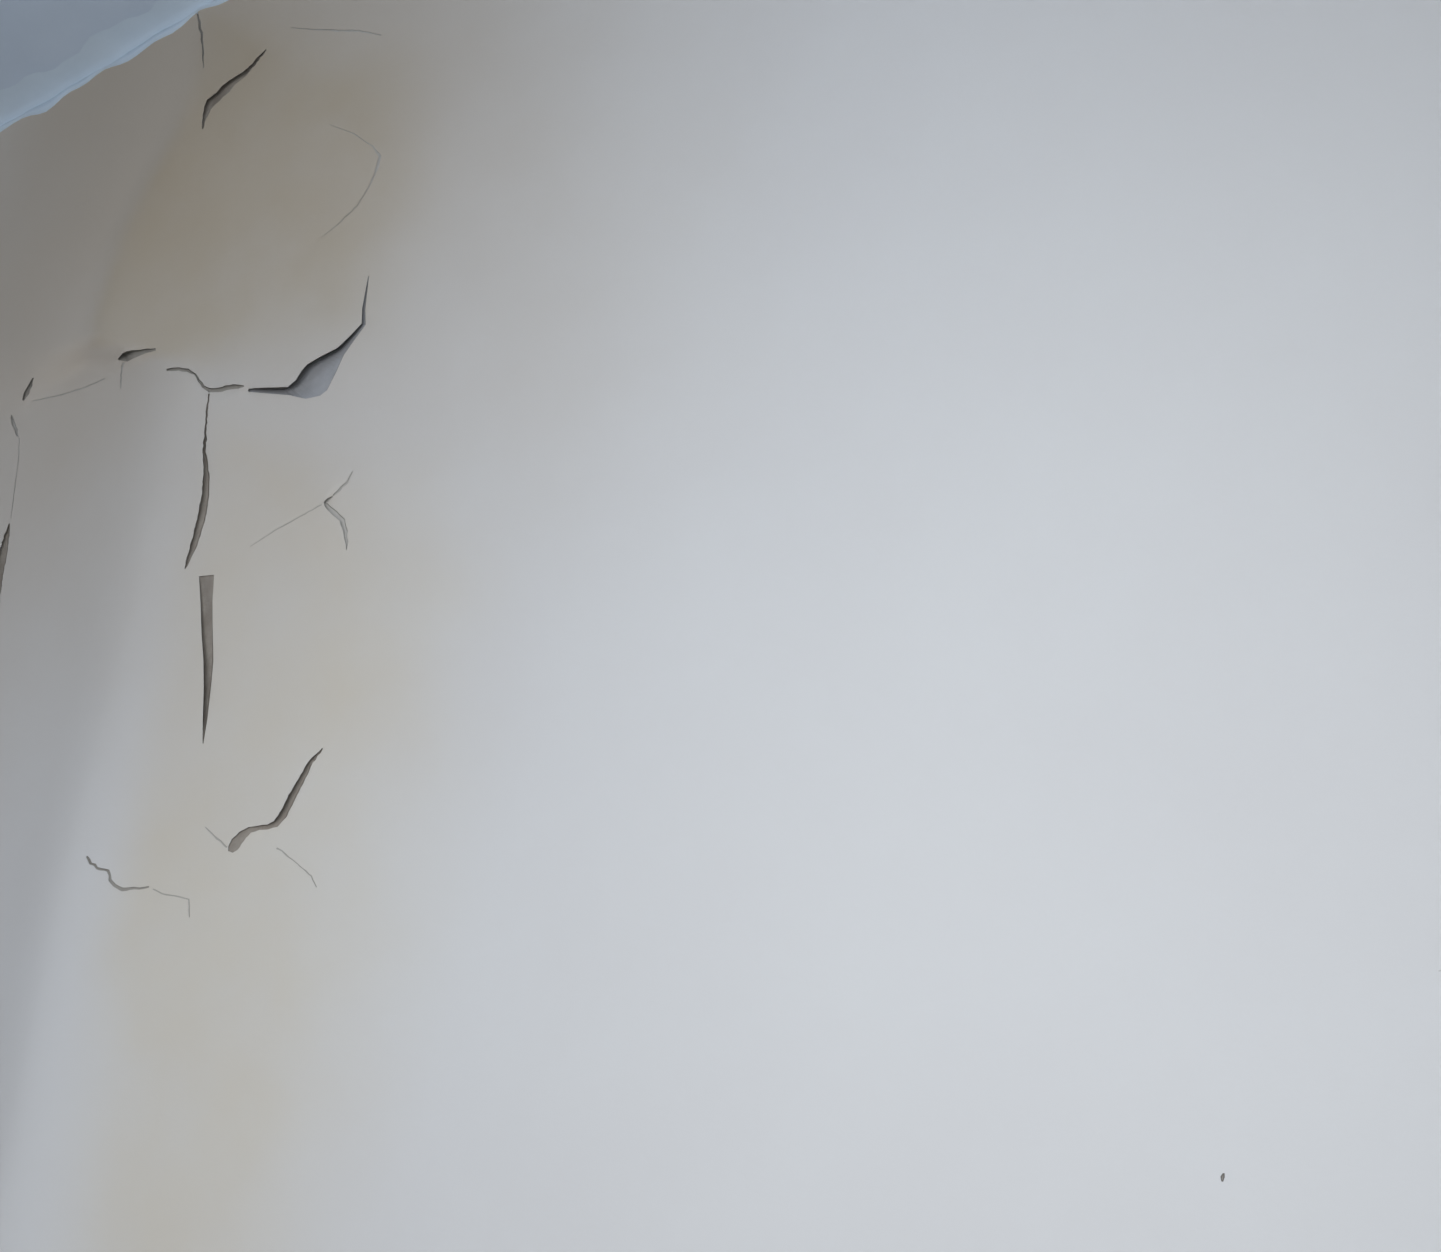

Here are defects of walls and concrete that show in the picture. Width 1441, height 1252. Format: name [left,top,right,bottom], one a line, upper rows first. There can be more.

crack [197,14,381,129]
crack [322,125,381,237]
crack [0,378,105,593]
crack [167,367,244,743]
crack [250,471,353,550]
crack [205,748,323,887]
crack [86,856,190,917]